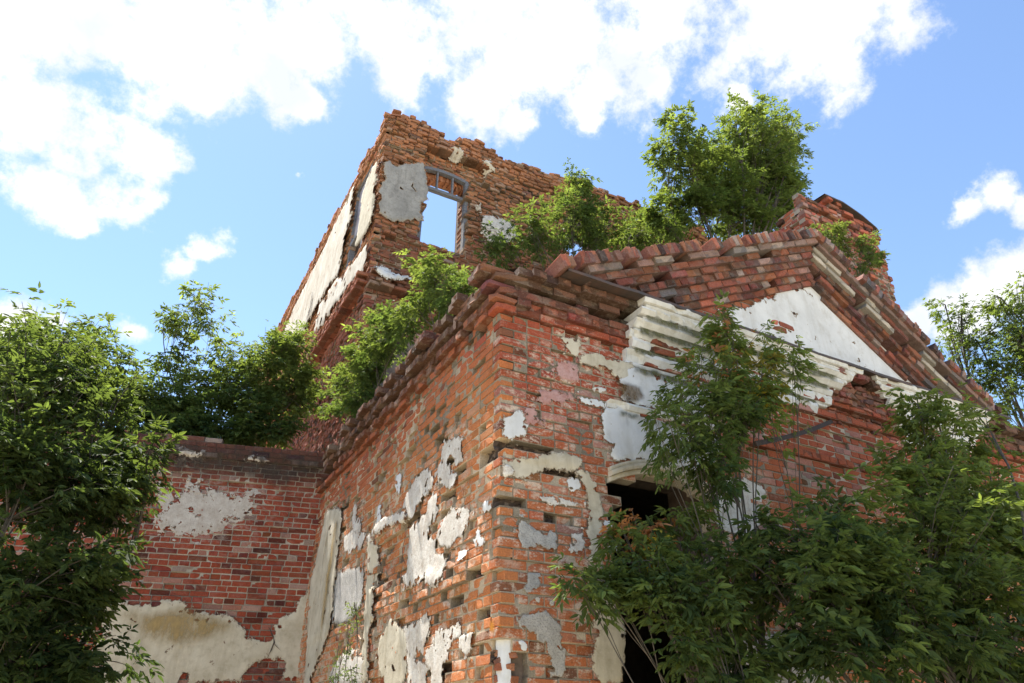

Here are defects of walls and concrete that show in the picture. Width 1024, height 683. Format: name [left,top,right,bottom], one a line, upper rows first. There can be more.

flaking render [283,161,429,335]
flaking render [475,199,518,243]
flaking render [718,287,911,442]
flaking render [97,336,716,683]